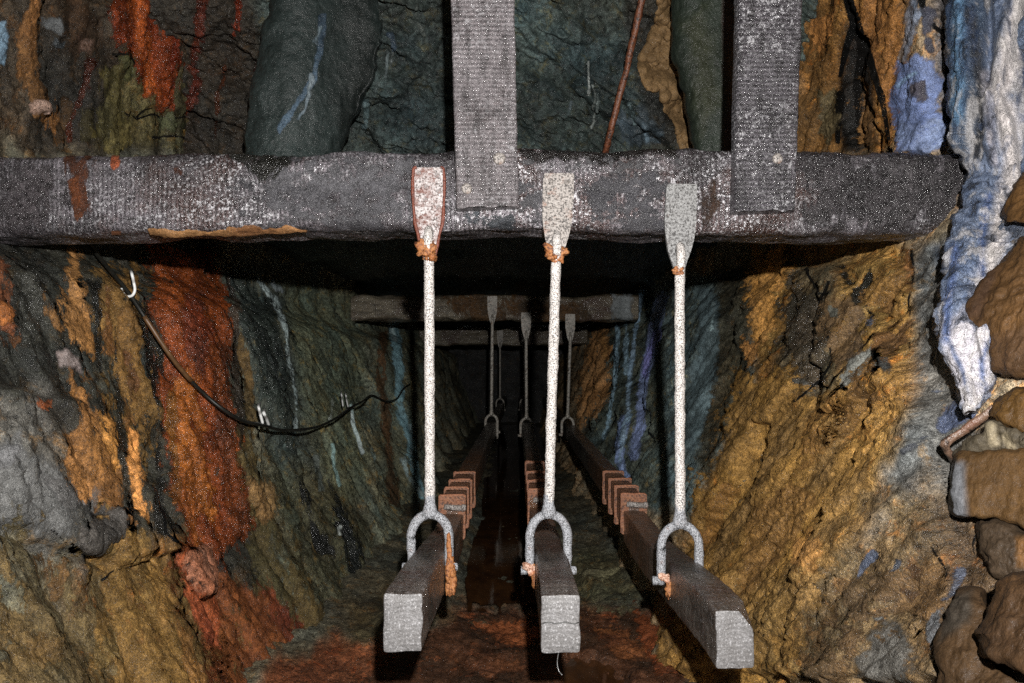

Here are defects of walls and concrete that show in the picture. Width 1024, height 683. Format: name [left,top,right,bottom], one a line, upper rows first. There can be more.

rust [106,0,208,118]
rust [63,57,98,221]
rust [411,166,446,263]
rust [542,243,569,263]
rust [445,532,457,597]
rust [522,562,536,589]
rust [658,572,671,600]